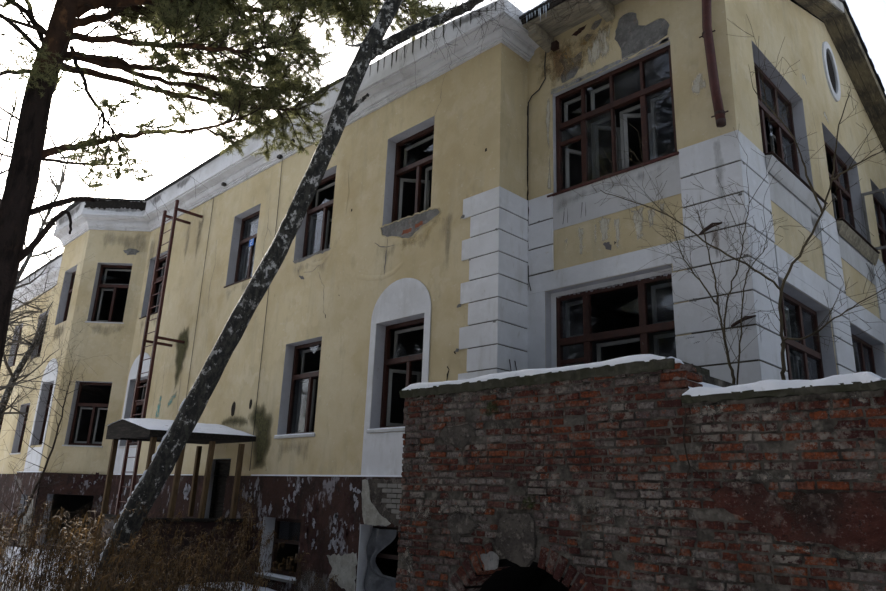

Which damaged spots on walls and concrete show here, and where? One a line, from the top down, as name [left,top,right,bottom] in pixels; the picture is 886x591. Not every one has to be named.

spalling [551,10,672,95]
spalling [380,207,441,240]
flaking render [282,478,402,591]